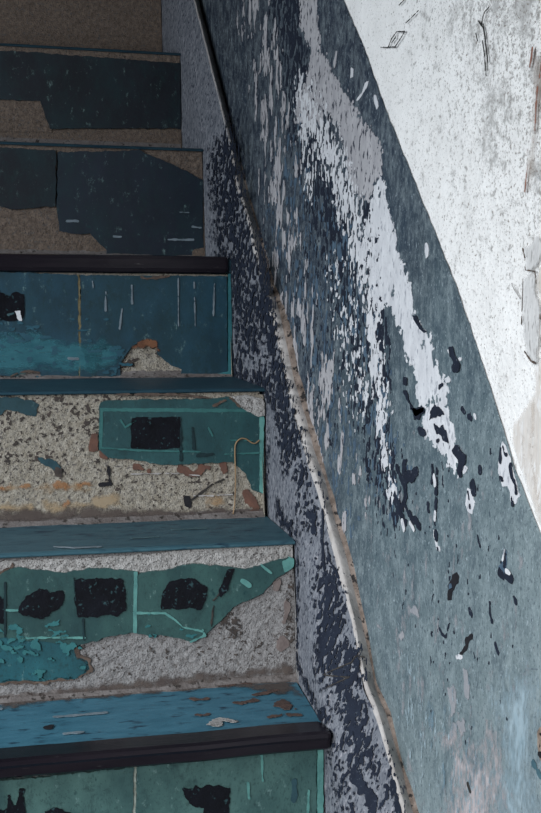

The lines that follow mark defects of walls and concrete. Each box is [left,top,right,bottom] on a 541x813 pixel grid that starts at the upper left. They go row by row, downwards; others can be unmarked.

spalling [0,0,468,551]
peeling [489,237,541,524]
spalling [0,459,401,813]
peeling [402,564,420,628]
peeling [432,544,469,603]
peeling [420,618,504,813]
peeling [465,465,482,530]